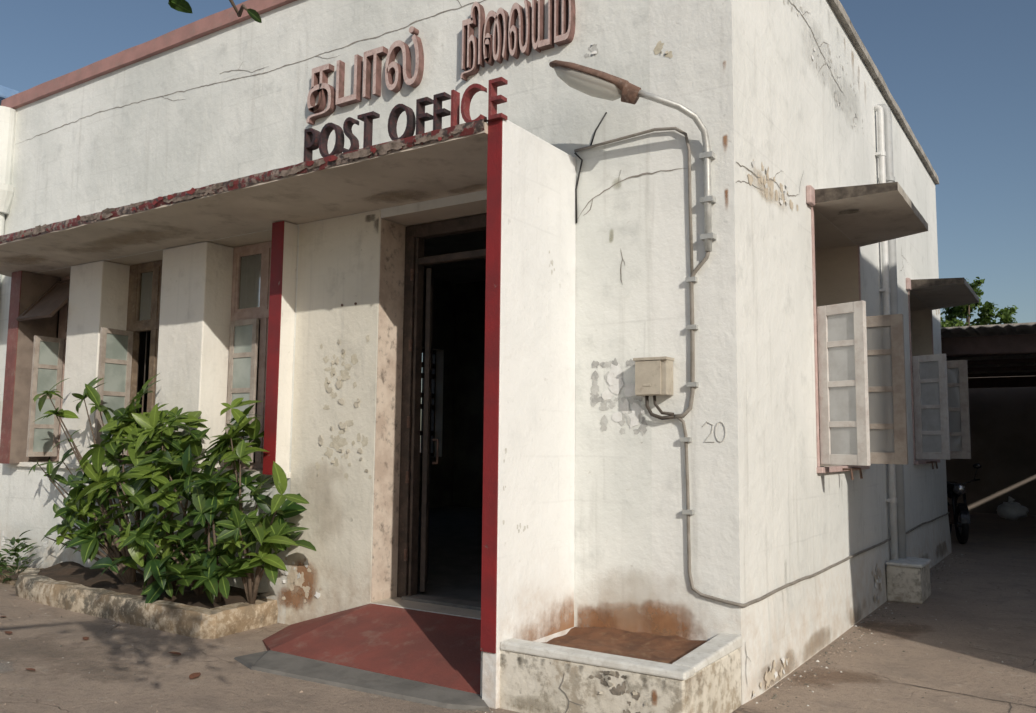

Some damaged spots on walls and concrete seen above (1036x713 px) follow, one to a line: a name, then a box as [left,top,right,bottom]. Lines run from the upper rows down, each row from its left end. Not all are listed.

crack [20,0,485,143]
crack [789,0,843,92]
crack [578,168,683,218]
peeling [748,160,799,211]
peeling [315,339,372,479]
peeling [590,358,647,436]
peeling [282,556,322,611]
water stain [531,605,574,641]
crack [559,675,584,713]
peeling [752,658,789,698]